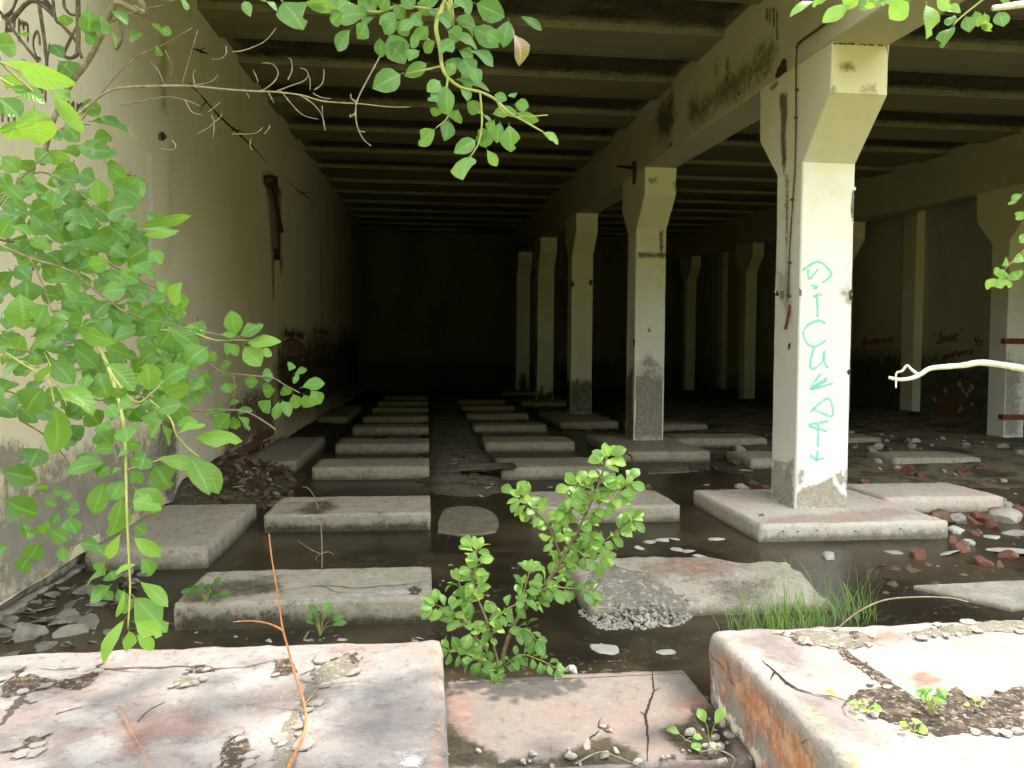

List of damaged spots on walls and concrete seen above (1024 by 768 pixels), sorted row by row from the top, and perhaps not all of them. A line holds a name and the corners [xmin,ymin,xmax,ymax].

water stain [694,9,778,120]
crack [189,83,319,209]
water stain [571,380,592,414]
water stain [626,356,663,440]
spalling [907,618,1024,640]
spalling [0,730,53,758]
spalling [167,662,218,689]
spalling [211,631,363,768]
crack [451,671,670,761]
crack [760,660,856,721]
spalling [790,627,1024,737]